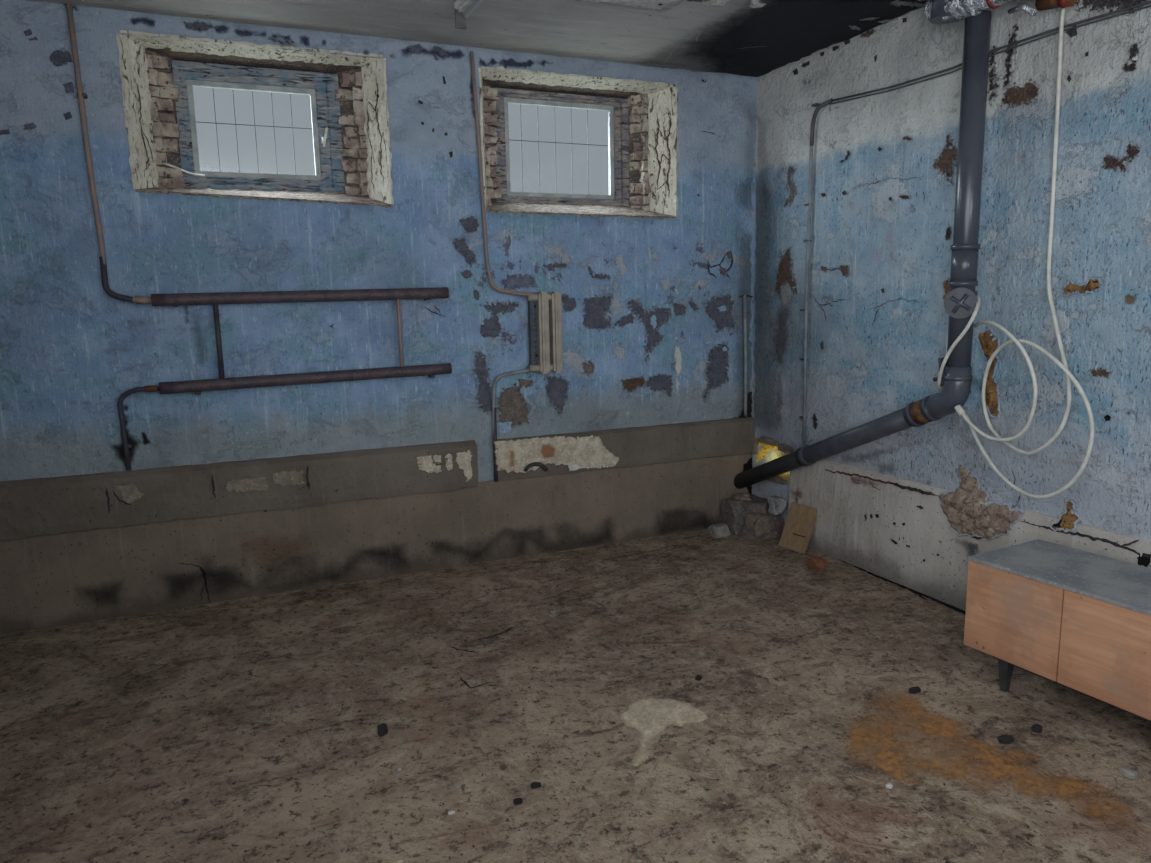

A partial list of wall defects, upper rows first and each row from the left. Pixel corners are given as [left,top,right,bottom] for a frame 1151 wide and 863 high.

peeling [987,23,1041,110]
flaking render [627,94,651,211]
crack [655,111,672,194]
peeling [931,133,958,186]
peeling [1101,141,1140,173]
peeling [450,215,571,434]
peeling [562,266,737,403]
flaking render [976,328,1001,419]
peeling [416,450,473,482]
crack [826,469,938,496]
flaking render [937,462,1025,541]
crack [1019,520,1151,558]